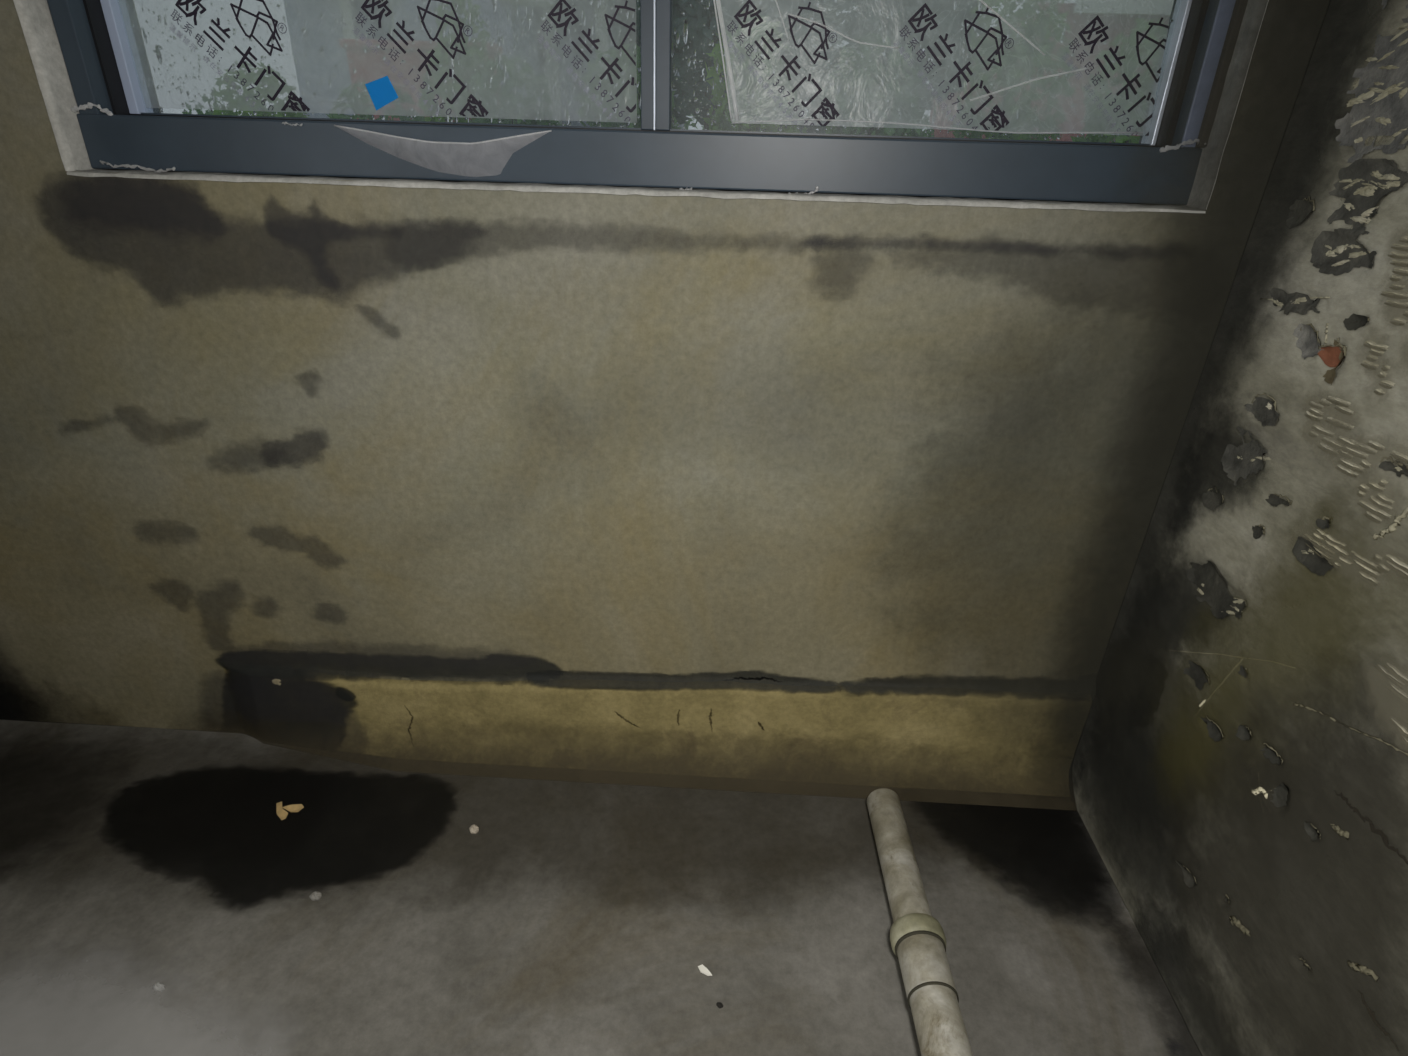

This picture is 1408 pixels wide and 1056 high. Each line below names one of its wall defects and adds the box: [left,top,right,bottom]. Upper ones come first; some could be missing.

flaking render [1286,4,1408,276]
flaking render [1269,288,1370,385]
damp [841,0,1408,1056]
flaking render [1185,560,1248,619]
flaking render [1202,393,1279,511]
flaking render [1252,524,1266,539]
flaking render [1265,494,1292,506]
flaking render [1292,516,1336,576]
flaking render [1379,456,1408,477]
damp [217,650,840,750]
damp [105,767,455,908]